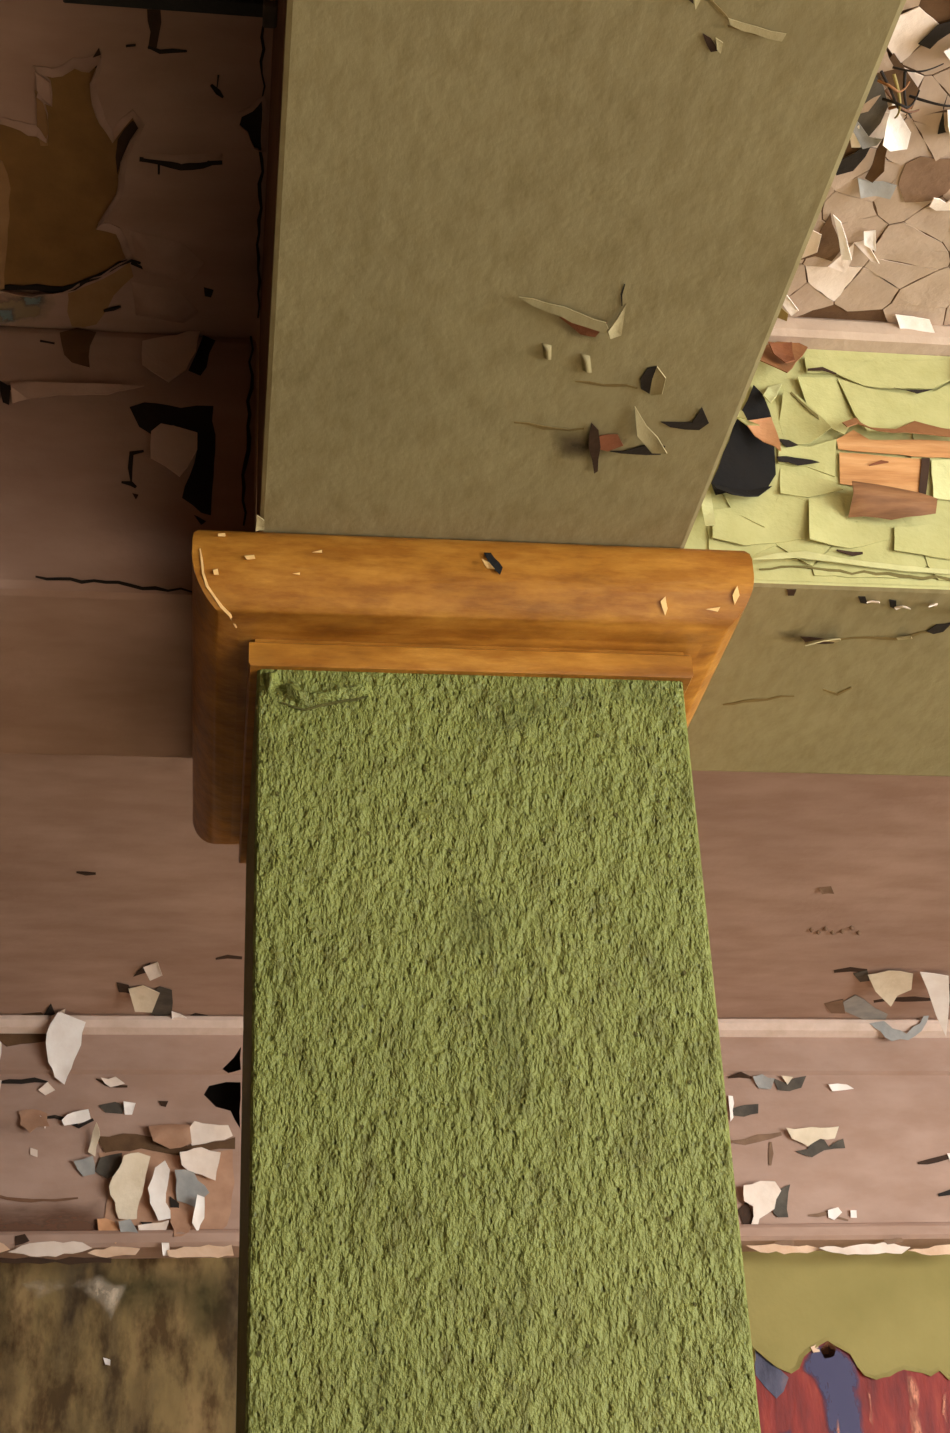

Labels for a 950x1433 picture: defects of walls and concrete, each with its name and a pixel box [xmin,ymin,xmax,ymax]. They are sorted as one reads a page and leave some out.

flaking render [836,53,950,211]
peeling [0,48,216,525]
crack [684,0,950,587]
flaking render [801,213,879,273]
peeling [701,342,950,581]
crack [35,576,192,593]
crack [841,623,950,640]
peeling [116,962,208,1019]
peeling [824,967,950,1041]
peeling [0,1004,241,1265]
peeling [731,1126,845,1224]
peeling [752,1337,950,1433]